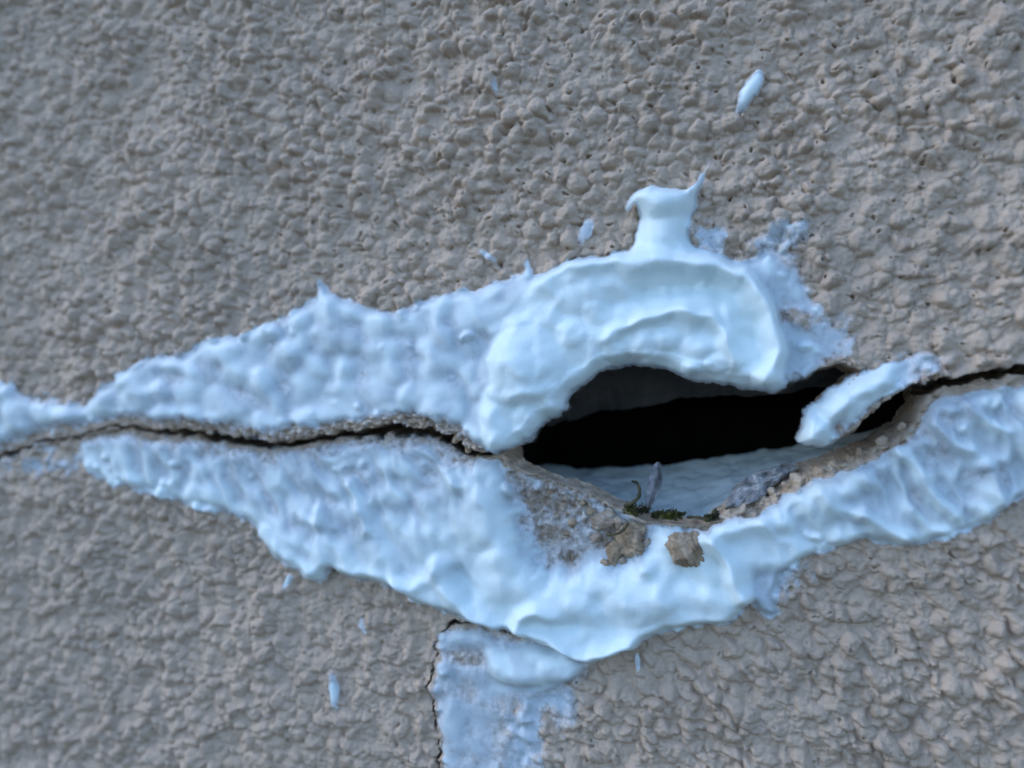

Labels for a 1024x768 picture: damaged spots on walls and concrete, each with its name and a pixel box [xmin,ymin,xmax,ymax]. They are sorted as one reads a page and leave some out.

crack [0,413,505,459]
spalling [507,386,831,568]
spalling [725,392,920,511]
crack [833,364,1024,441]
crack [425,619,511,768]